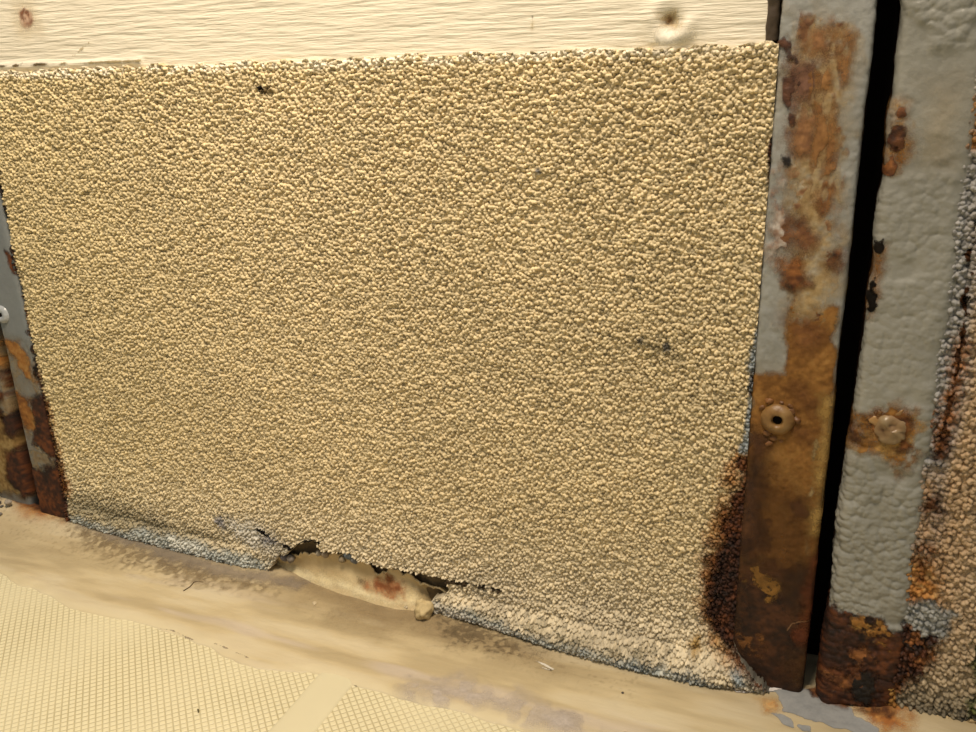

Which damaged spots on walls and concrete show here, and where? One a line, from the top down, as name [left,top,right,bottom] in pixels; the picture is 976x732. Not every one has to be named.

rust [0,245,71,522]
rust [690,13,942,731]
spalling [276,540,449,620]